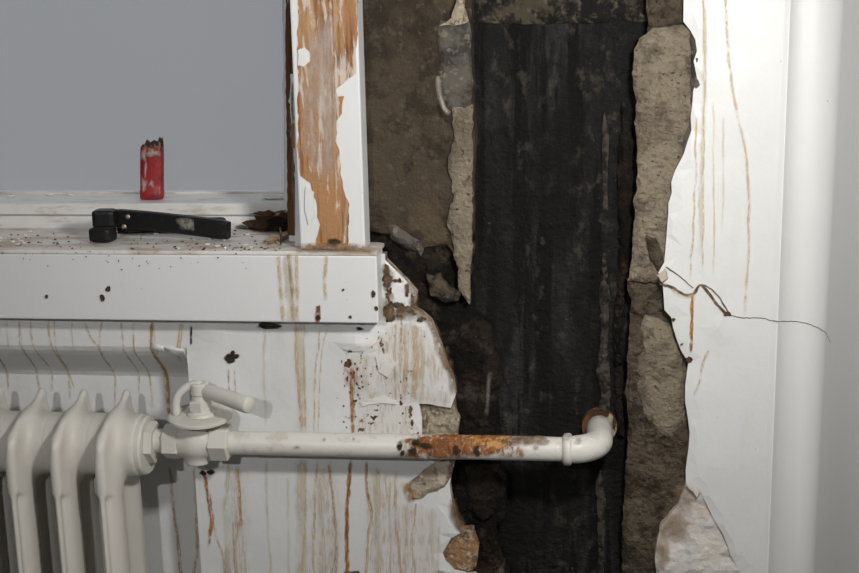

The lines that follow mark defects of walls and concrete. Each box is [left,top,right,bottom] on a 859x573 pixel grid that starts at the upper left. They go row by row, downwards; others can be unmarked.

flaking render [285,0,505,436]
flaking render [621,0,740,573]
rust [150,324,170,415]
rust [169,470,182,573]
rust [203,475,225,572]
flaking render [405,459,510,573]